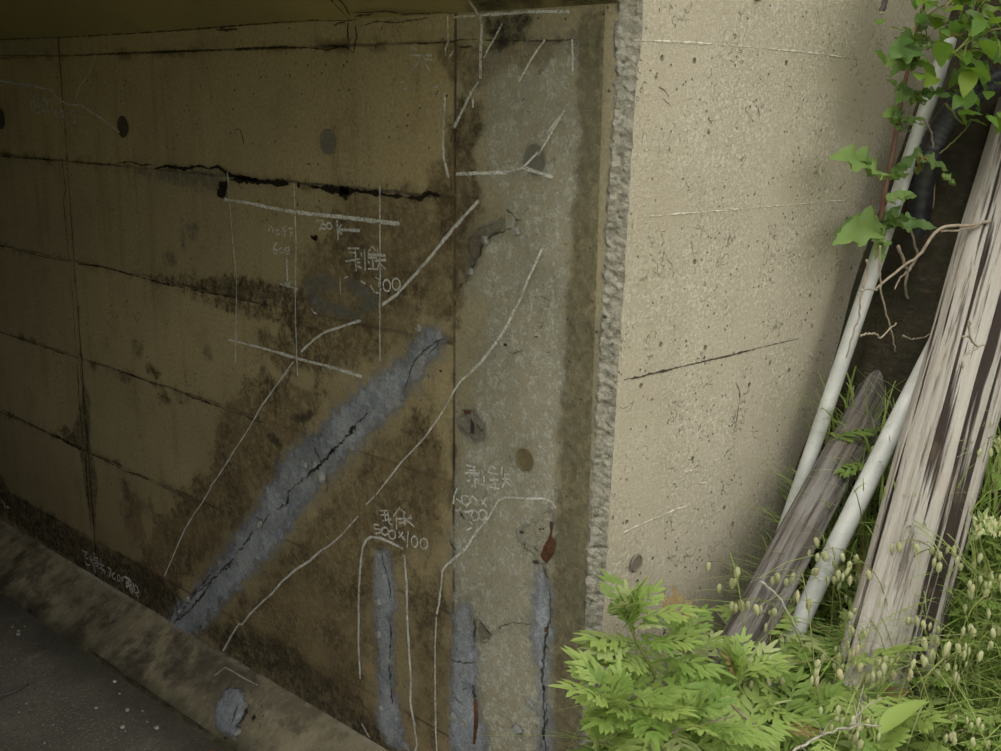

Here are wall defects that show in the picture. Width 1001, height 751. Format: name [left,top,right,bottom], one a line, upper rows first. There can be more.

damp [440,0,542,87]
damp [0,98,484,620]
crack [185,394,264,423]